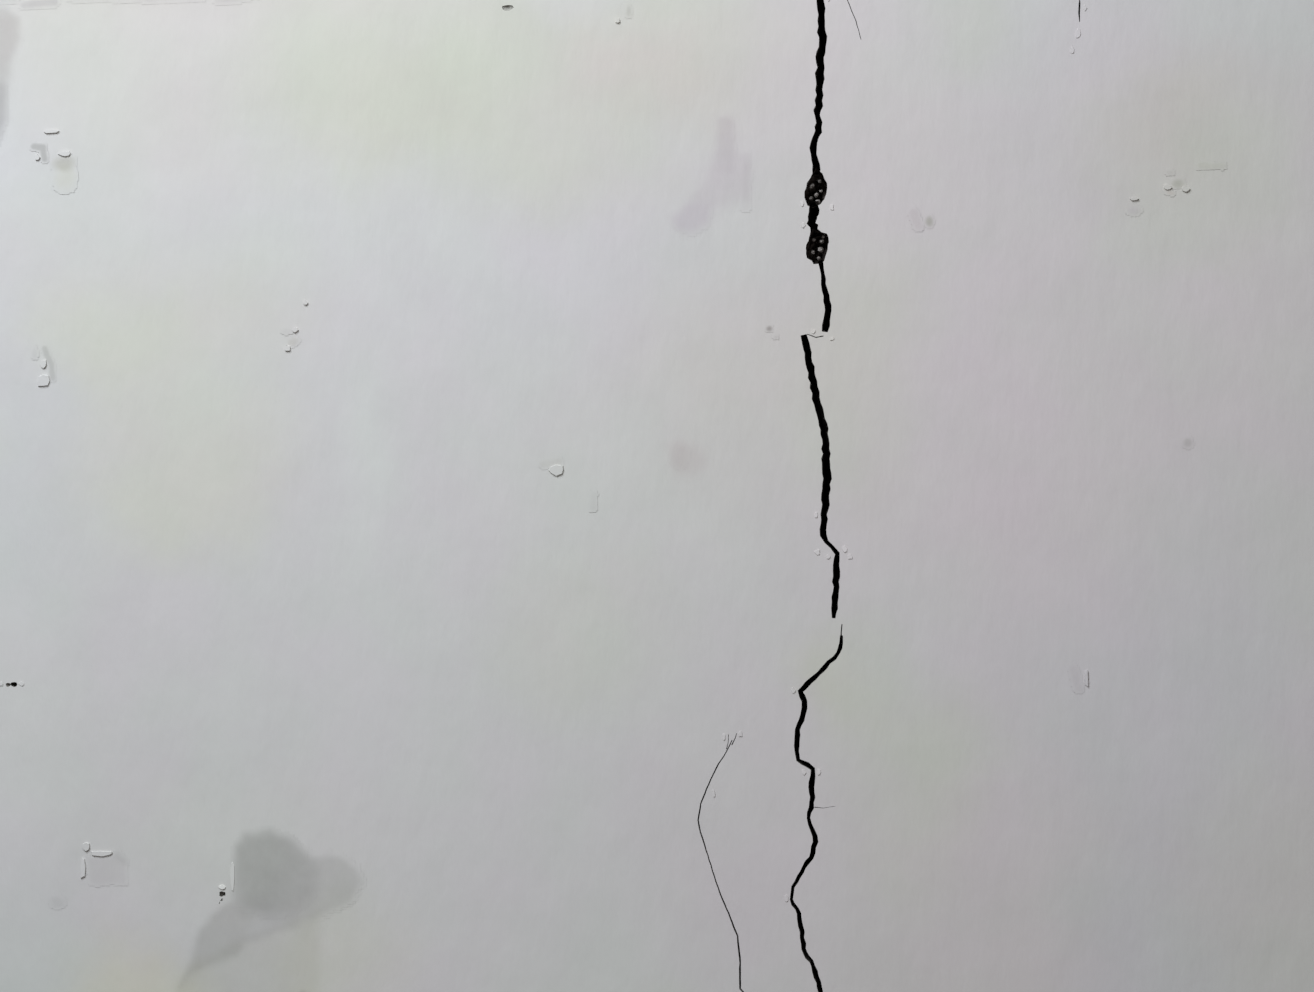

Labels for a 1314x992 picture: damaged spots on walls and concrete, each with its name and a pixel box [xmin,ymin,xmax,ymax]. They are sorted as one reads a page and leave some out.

damp [0,0,251,146]
crack [785,0,861,992]
damp [170,826,367,992]
crack [697,731,744,992]